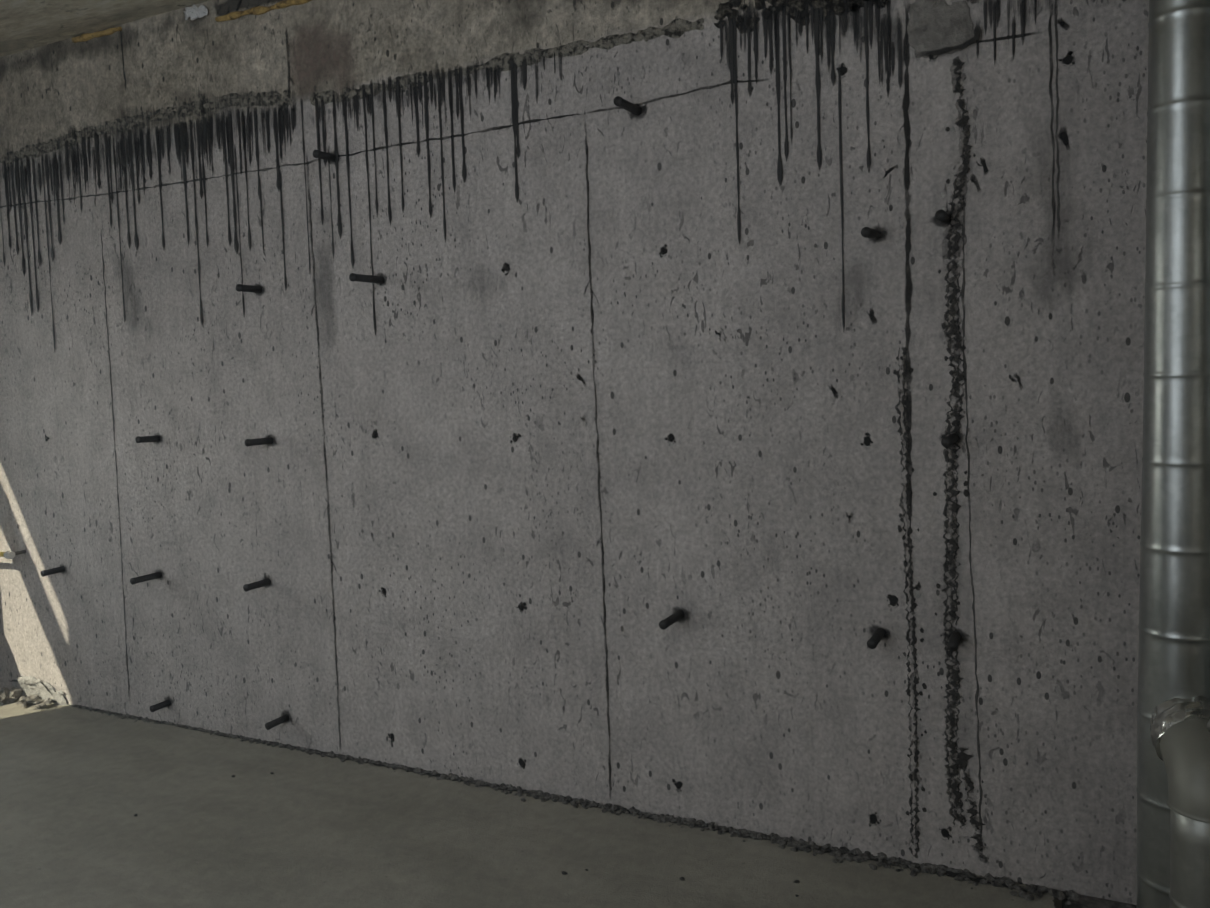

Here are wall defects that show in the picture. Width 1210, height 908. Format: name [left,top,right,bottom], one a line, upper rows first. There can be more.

leakage [0,28,562,351]
leakage [720,0,906,331]
leakage [976,0,1056,64]